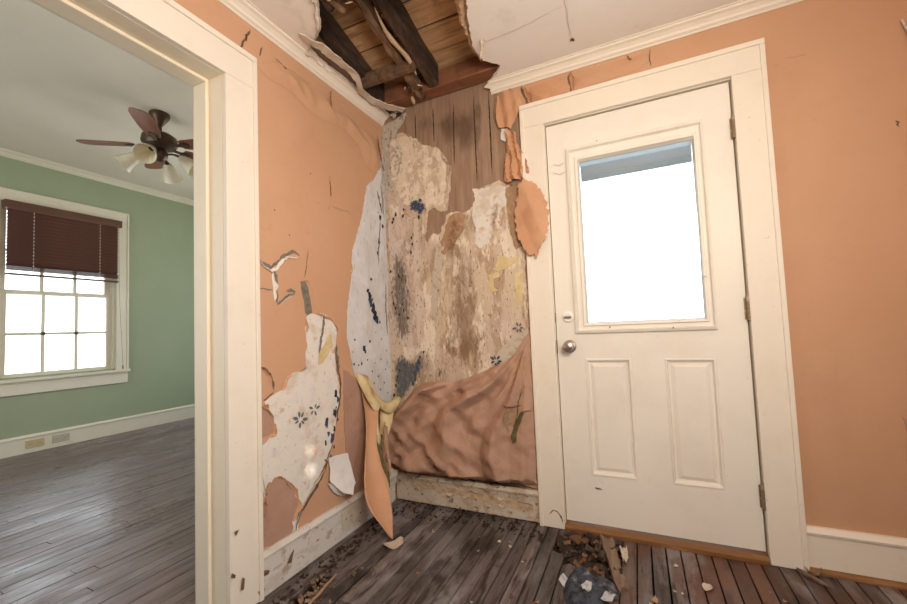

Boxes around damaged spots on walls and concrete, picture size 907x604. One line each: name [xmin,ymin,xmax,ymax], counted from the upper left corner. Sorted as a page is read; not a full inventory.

spalling [464,0,482,62]
damp [391,199,426,224]
damp [390,256,410,337]
peeling [262,401,277,467]